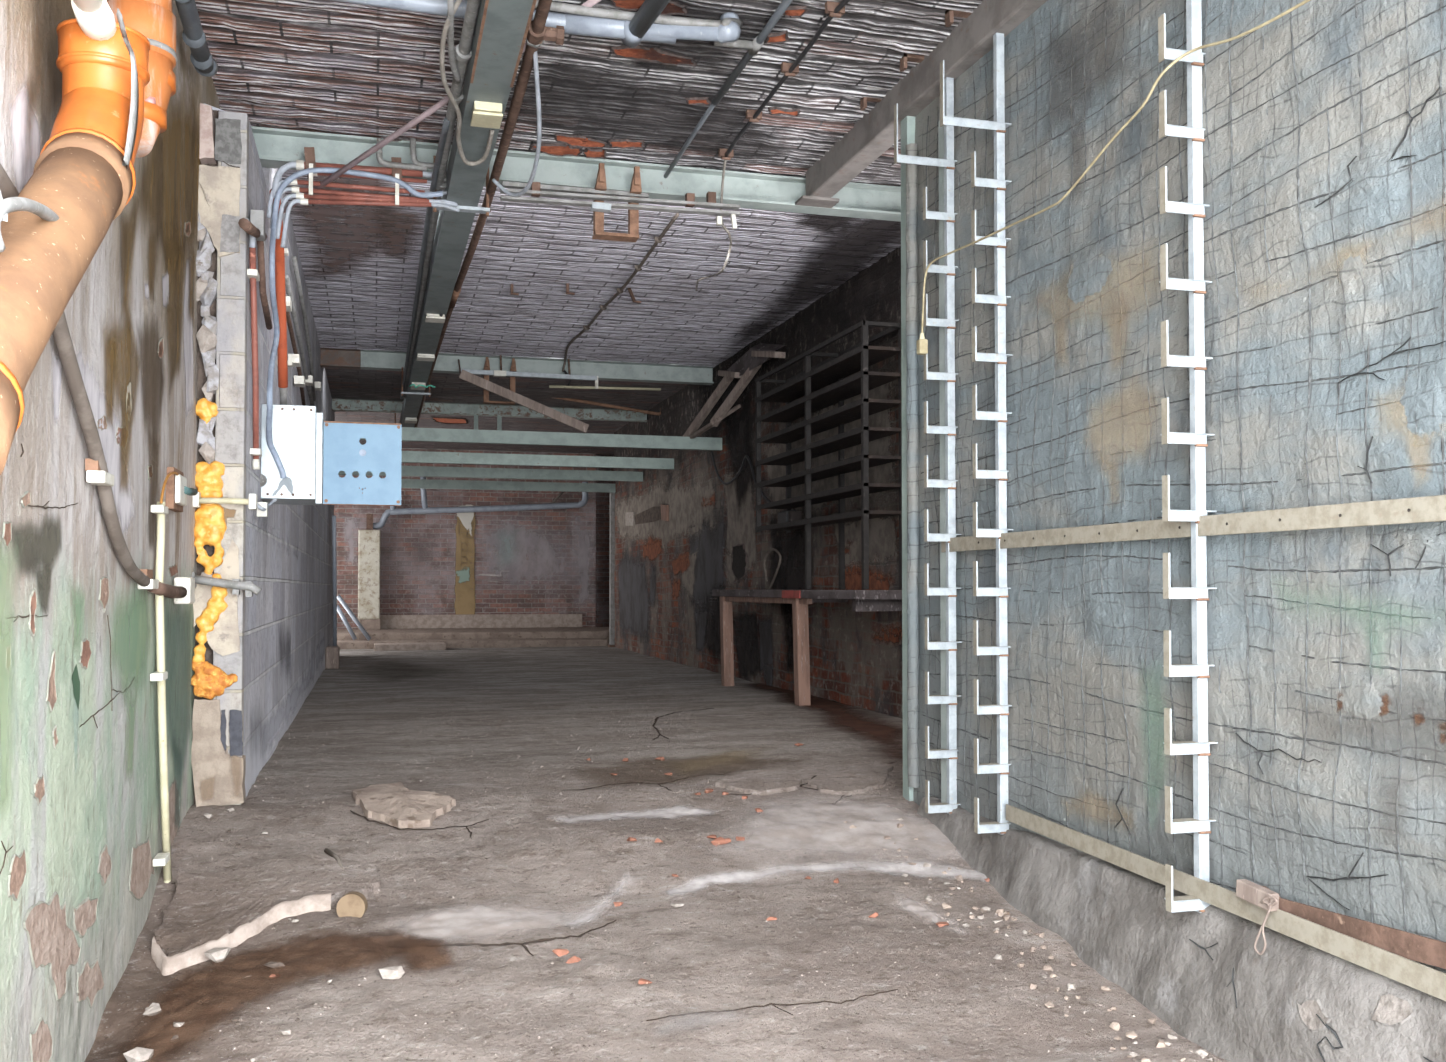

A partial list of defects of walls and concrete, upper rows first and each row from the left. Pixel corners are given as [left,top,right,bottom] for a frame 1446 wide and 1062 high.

crack [1315,87,1441,208]
damp [53,107,201,545]
damp [14,519,61,611]
crack [1235,733,1320,774]
peeling [7,844,112,1008]
peeling [129,837,155,901]
crack [440,920,616,957]
damp [671,802,986,892]
crack [1307,853,1389,910]
peeling [29,1017,53,1062]
damp [125,908,591,1062]
crack [646,989,898,1021]